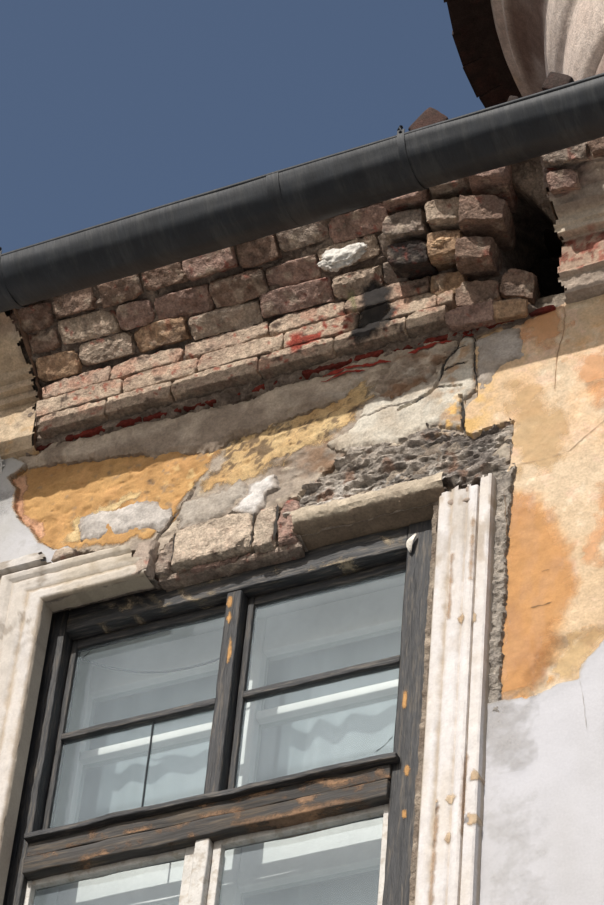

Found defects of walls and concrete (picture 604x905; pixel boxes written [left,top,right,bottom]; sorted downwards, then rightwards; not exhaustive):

spalling [9,137,604,713]
crack [554,304,566,388]